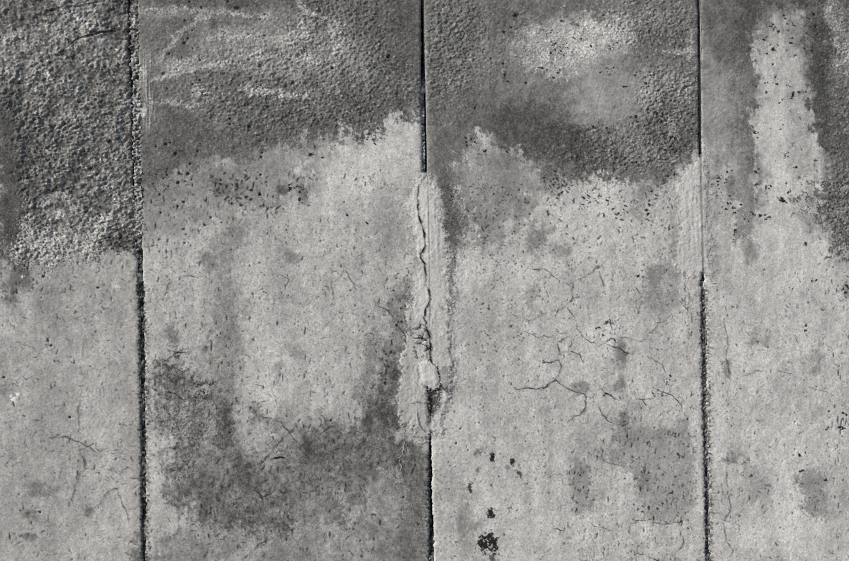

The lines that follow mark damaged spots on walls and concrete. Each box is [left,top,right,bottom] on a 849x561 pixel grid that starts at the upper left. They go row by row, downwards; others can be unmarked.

damp [0,96,117,276]
damp [138,0,849,278]
damp [146,340,430,541]
crack [375,175,448,471]
crack [514,264,692,423]